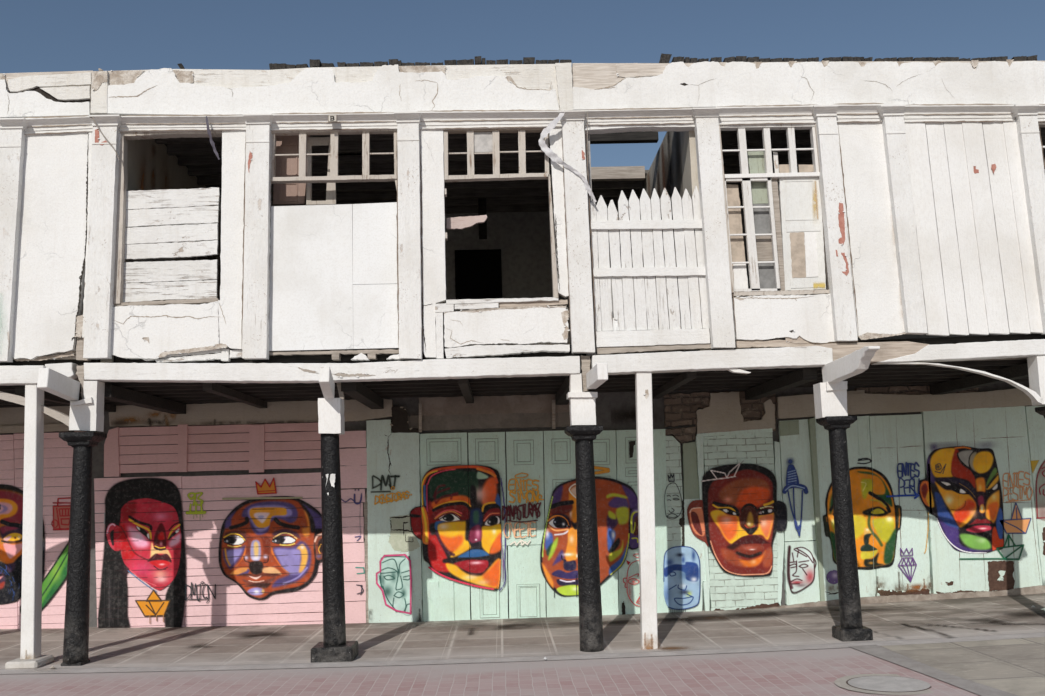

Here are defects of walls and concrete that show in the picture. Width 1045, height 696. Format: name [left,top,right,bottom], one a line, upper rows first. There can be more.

flaking render [90,70,145,91]
flaking render [173,70,194,83]
flaking render [615,63,668,78]
crack [5,80,155,114]
crack [40,146,88,357]
crack [114,303,226,324]
flaking render [664,391,776,444]